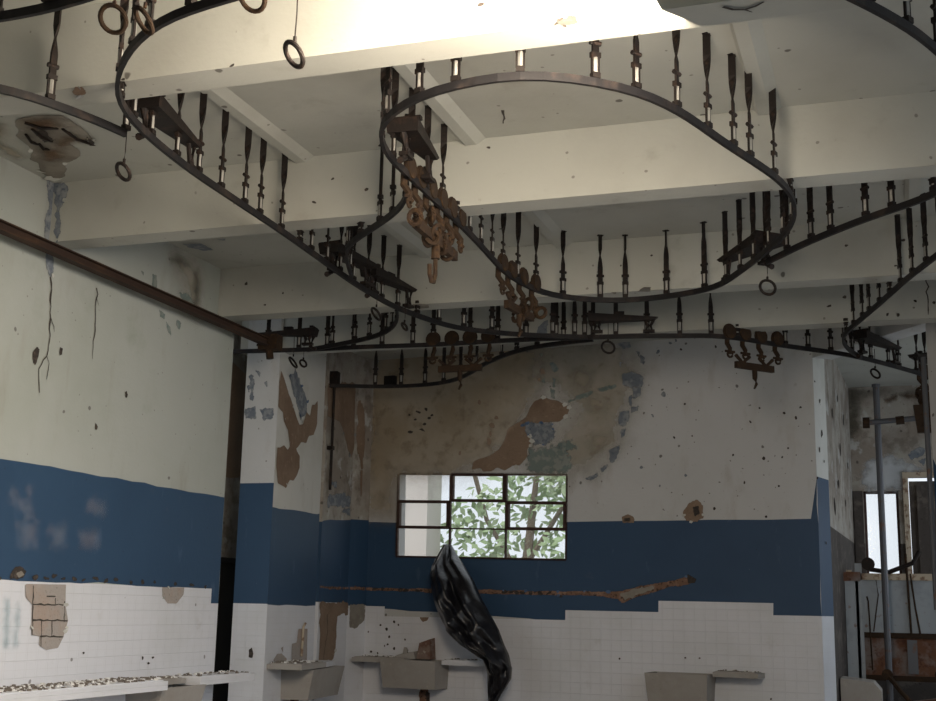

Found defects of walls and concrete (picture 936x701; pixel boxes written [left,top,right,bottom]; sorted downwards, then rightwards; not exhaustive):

crack [38,277,54,393]
flaking render [244,369,365,516]
flaking render [472,342,645,480]
spalling [682,500,716,523]
peeling [25,574,118,650]
peeling [130,580,207,604]
peeling [274,622,308,661]
flaking render [319,600,369,660]